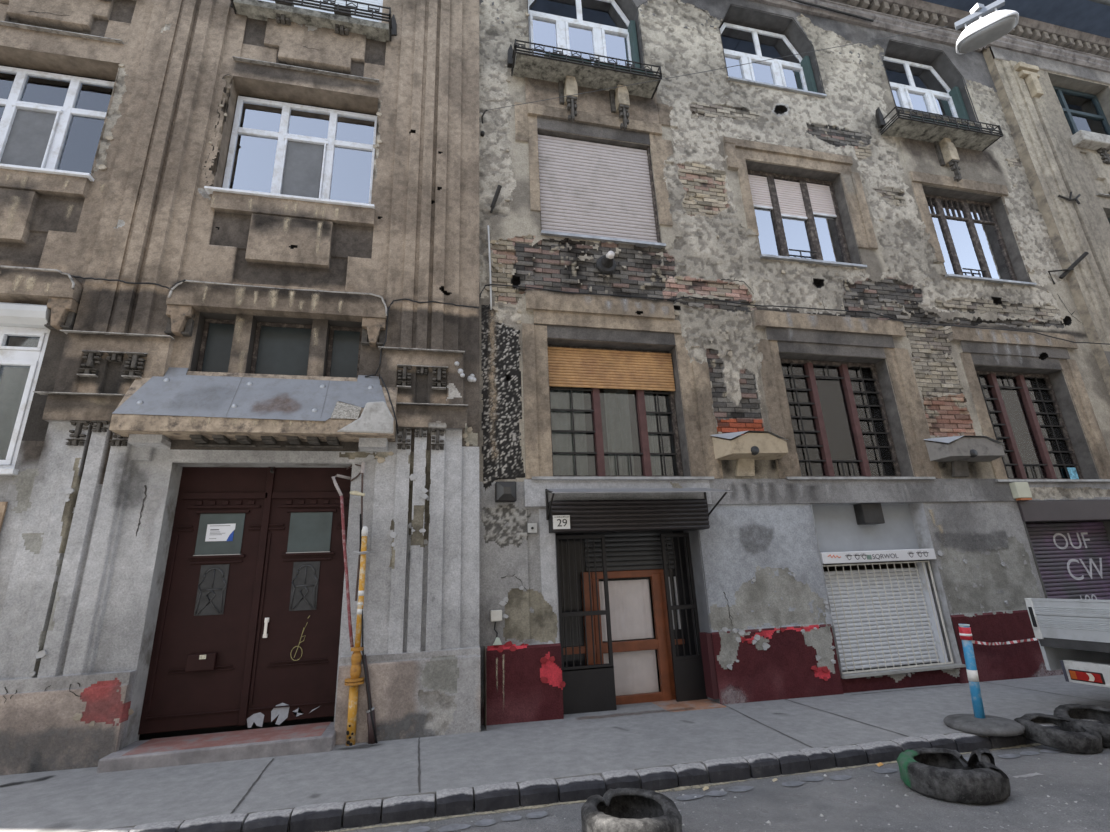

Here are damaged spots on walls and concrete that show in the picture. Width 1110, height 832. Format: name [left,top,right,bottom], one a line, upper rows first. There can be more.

flaking render [479,0,1066,437]
crack [136,485,147,536]
peeling [487,586,566,690]
peeling [708,566,836,681]
peeling [72,678,134,726]